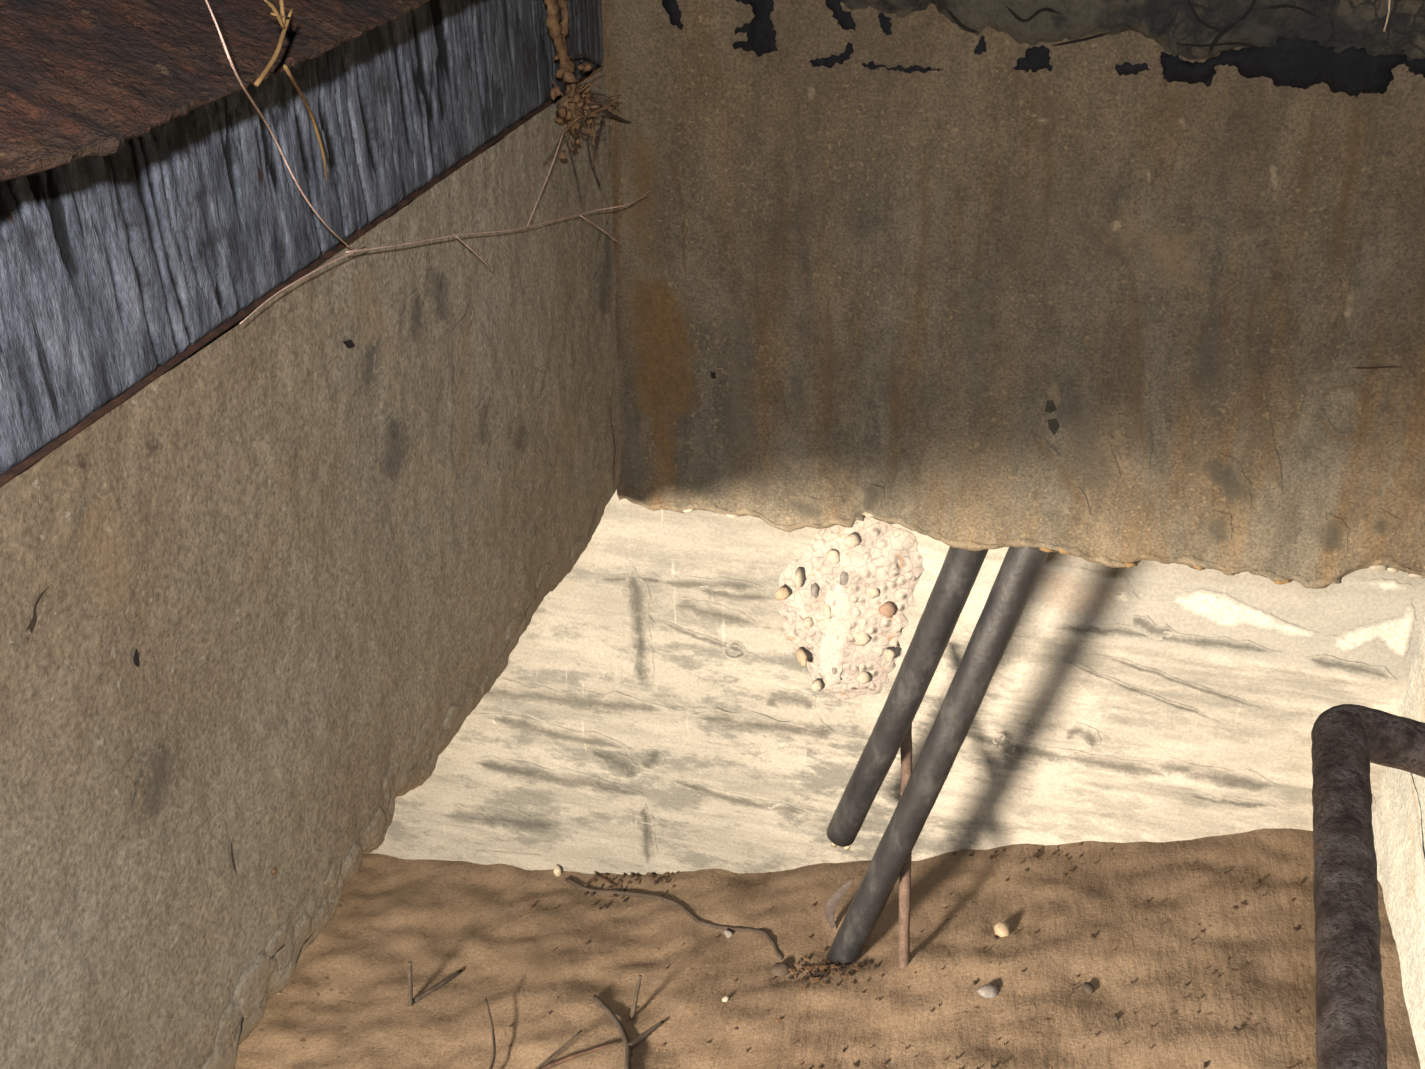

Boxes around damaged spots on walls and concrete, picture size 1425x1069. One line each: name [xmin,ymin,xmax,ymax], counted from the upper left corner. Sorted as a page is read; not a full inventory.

peeling [662,0,684,30]
peeling [732,0,778,57]
peeling [809,0,1425,97]
damp [1073,168,1238,424]
damp [620,293,819,500]
damp [782,484,884,523]
damp [1198,452,1251,551]
damp [1316,508,1402,556]